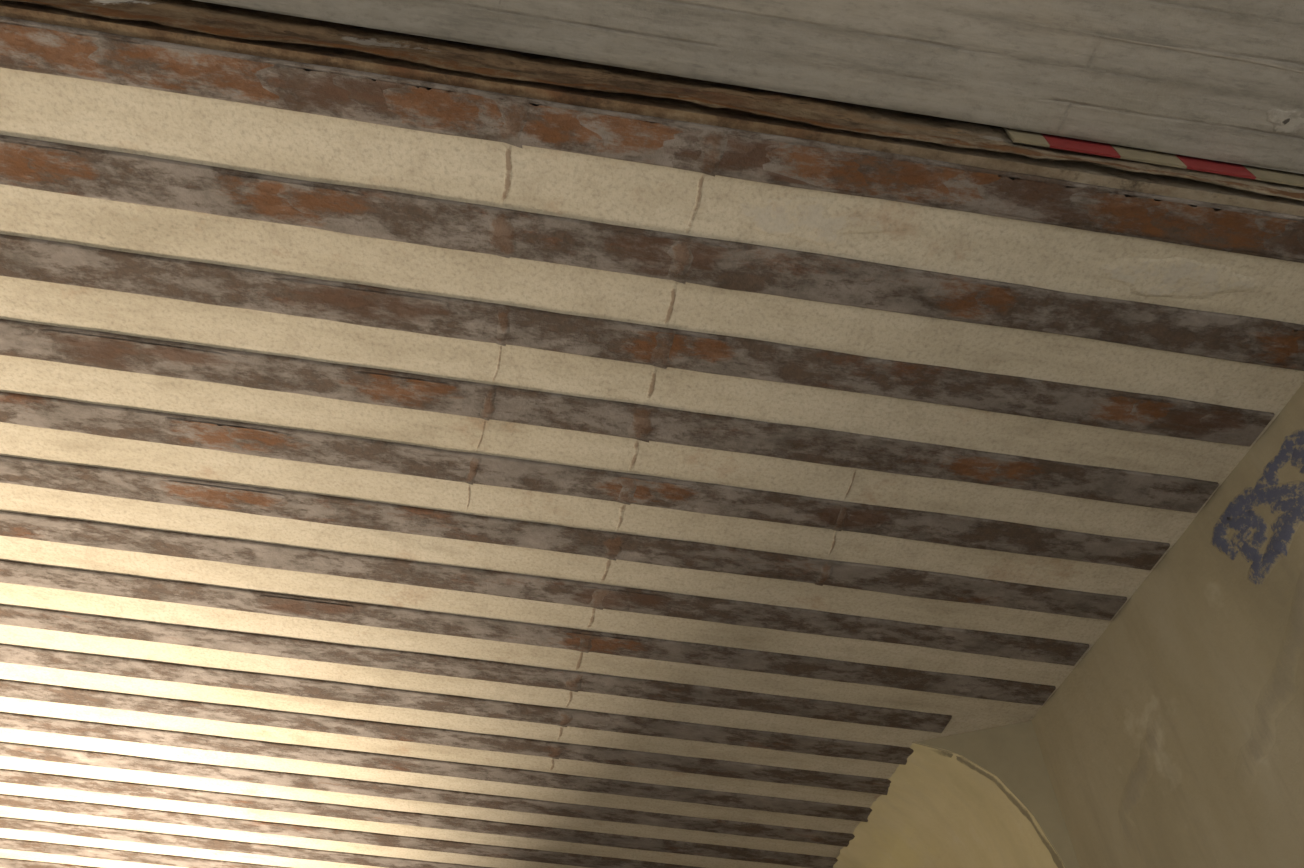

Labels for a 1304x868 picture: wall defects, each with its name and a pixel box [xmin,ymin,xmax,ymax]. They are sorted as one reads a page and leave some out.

spalling [79,0,997,141]
corrosion [0,0,1304,260]
corrosion [269,278,466,327]
corrosion [14,328,260,375]
corrosion [160,417,316,456]
corrosion [333,306,510,512]
corrosion [1086,394,1255,438]
corrosion [932,452,1049,485]
corrosion [150,480,299,510]
corrosion [546,230,743,772]
corrosion [798,469,899,586]
corrosion [248,595,359,620]